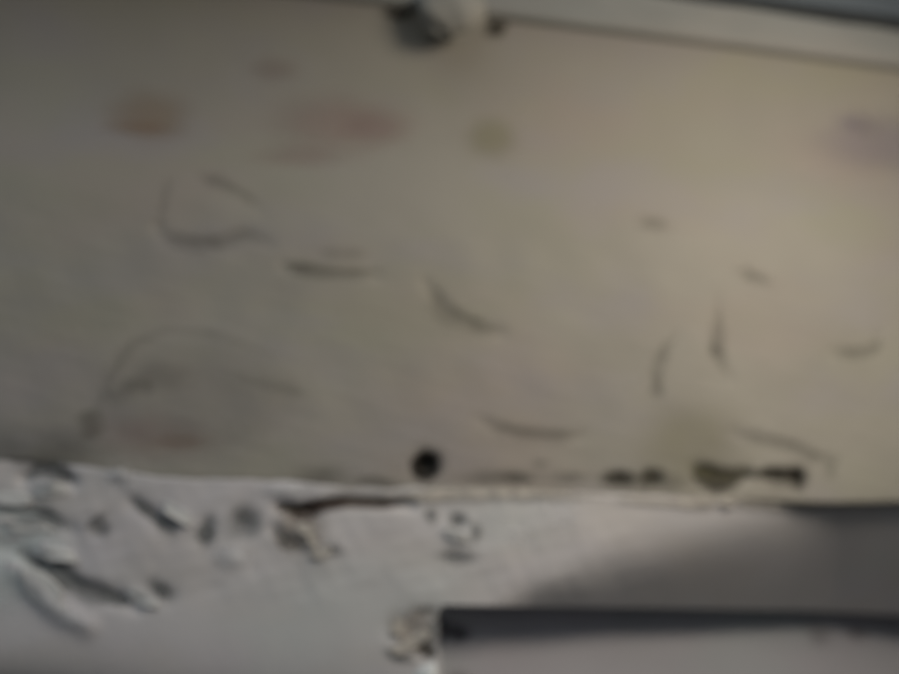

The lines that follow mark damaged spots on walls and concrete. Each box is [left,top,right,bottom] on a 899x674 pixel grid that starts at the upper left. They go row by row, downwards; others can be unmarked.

peeling [0,465,169,624]
peeling [136,500,212,543]
spalling [276,515,336,560]
spalling [349,487,570,520]
spalling [604,471,661,486]
spalling [622,465,818,509]
spalling [389,609,438,661]